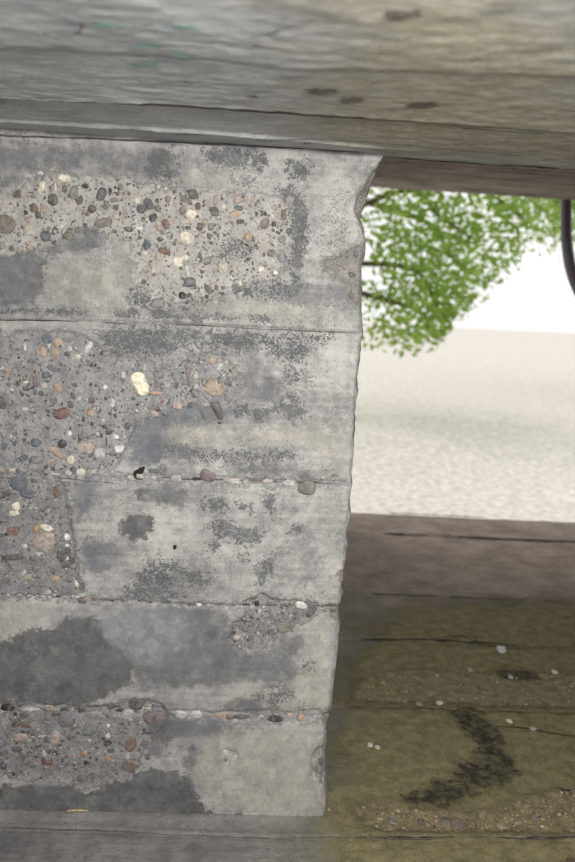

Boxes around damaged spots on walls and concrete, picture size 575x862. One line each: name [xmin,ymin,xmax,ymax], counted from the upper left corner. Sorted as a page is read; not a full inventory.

crack [0,96,571,134]
crack [0,133,575,199]
spalling [0,145,339,604]
spalling [197,488,339,658]
damp [0,608,303,706]
spalling [0,697,170,791]